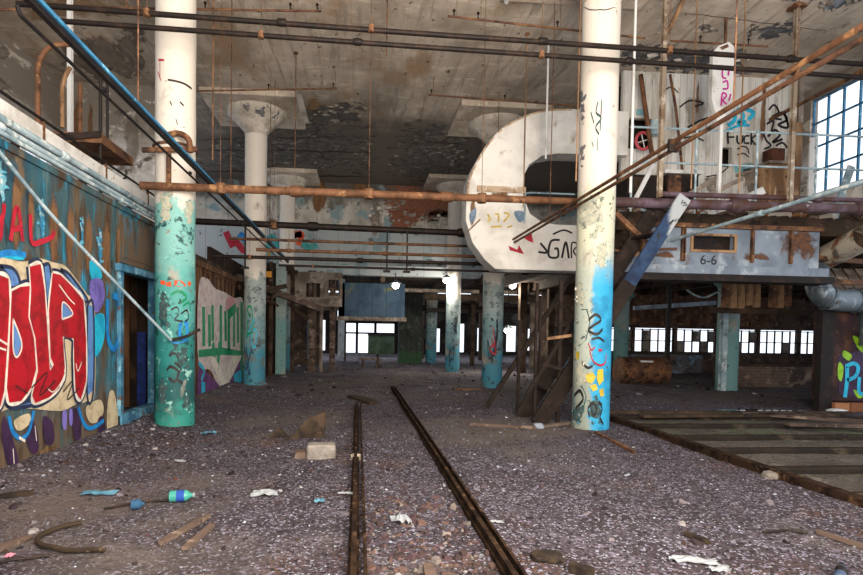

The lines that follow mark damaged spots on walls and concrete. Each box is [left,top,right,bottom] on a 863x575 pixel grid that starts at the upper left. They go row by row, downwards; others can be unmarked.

peeling [783,0,862,12]
peeling [368,119,468,236]
peeling [159,191,193,234]
corrosion [785,232,816,260]
peeling [159,290,171,329]